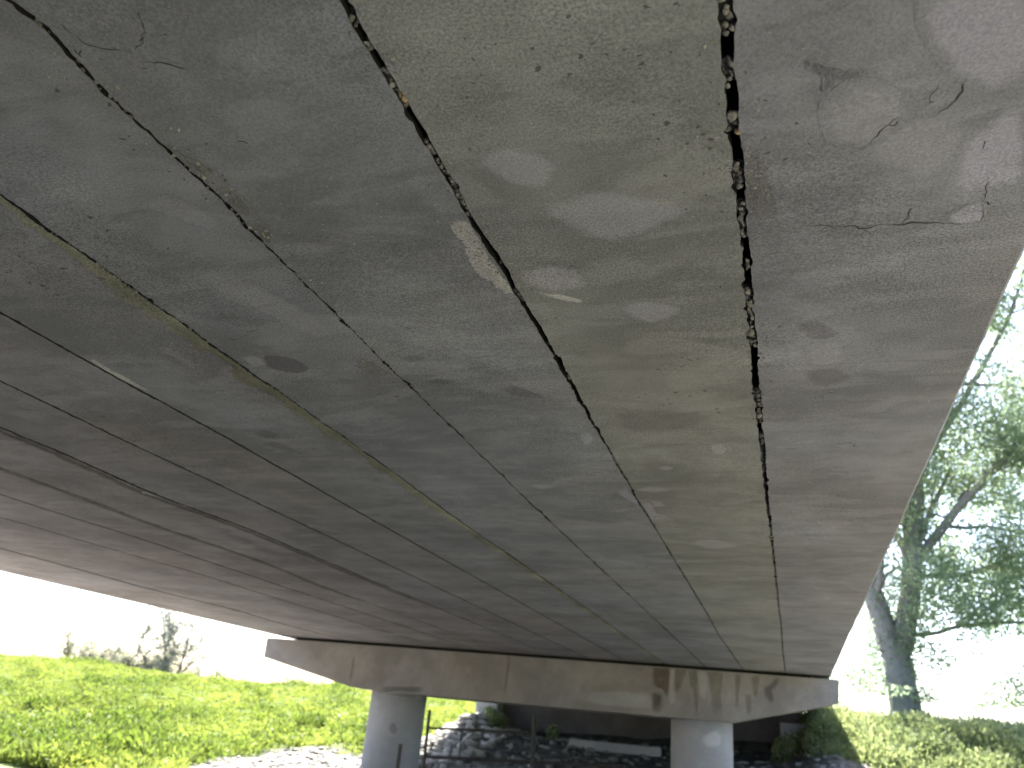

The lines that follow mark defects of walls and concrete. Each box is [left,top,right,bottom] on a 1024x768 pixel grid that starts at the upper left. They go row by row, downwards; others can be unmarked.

crack [924,83,964,116]
crack [815,183,990,234]
efflorescence [447,213,589,304]
crack [0,0,743,684]
crack [696,0,786,673]
leakage [577,669,781,721]